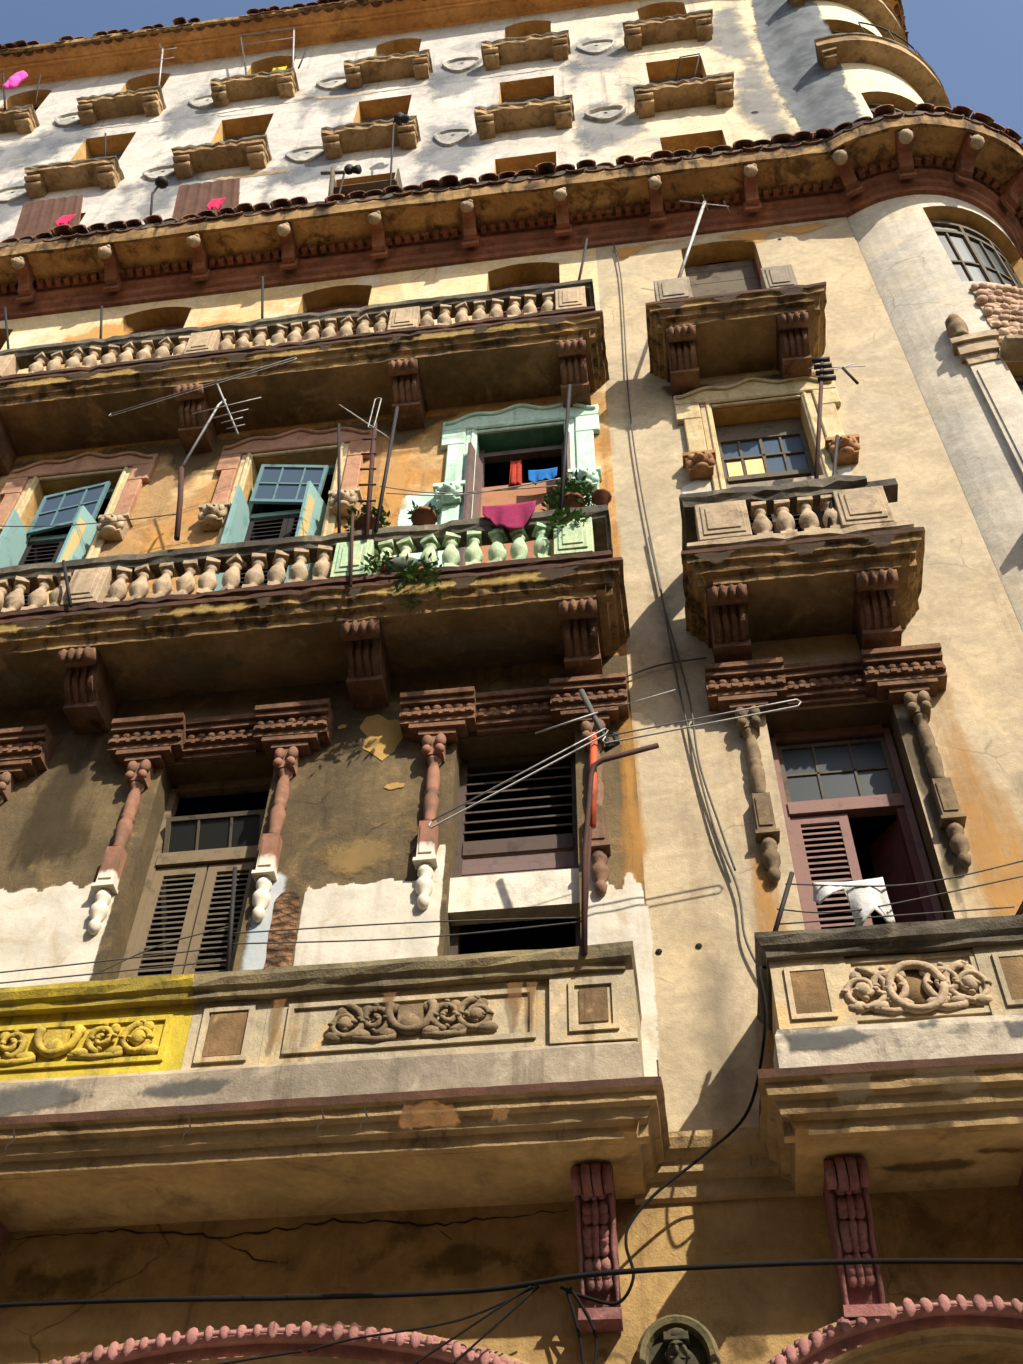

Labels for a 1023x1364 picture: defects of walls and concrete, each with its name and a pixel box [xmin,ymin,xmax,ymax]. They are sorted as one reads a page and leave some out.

leakage [706,0,861,136]
peeling [338,714,403,760]
peeling [243,844,446,970]
peeling [0,881,118,988]
peeling [582,839,659,1077]
leakage [787,1028,872,1050]
leakage [1005,1021,1023,1037]
leakage [0,1082,94,1115]
leakage [143,1079,228,1097]
crack [11,1210,568,1262]